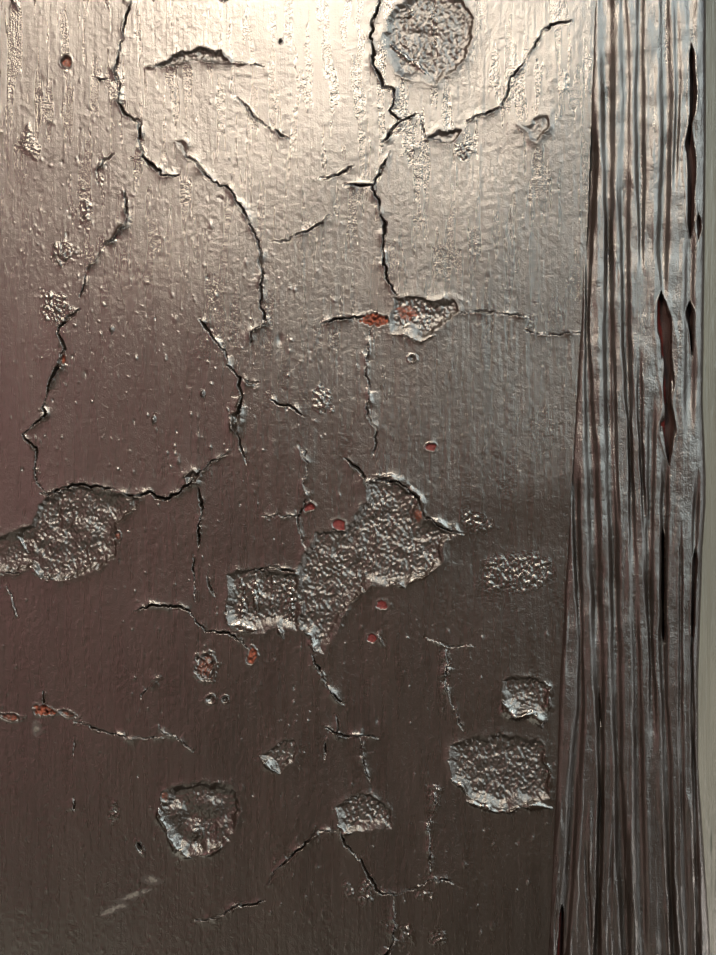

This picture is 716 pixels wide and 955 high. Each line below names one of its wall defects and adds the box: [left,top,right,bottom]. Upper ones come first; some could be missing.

crack [463,17,577,124]
crack [317,0,429,295]
crack [90,0,333,574]
corrosion [357,301,426,330]
peeling [385,293,462,365]
crack [20,189,249,650]
crack [319,314,467,536]
peeling [221,567,299,638]
corrosion [375,599,391,611]
peeling [445,674,554,814]
peeling [156,778,244,859]
peeling [333,790,396,837]